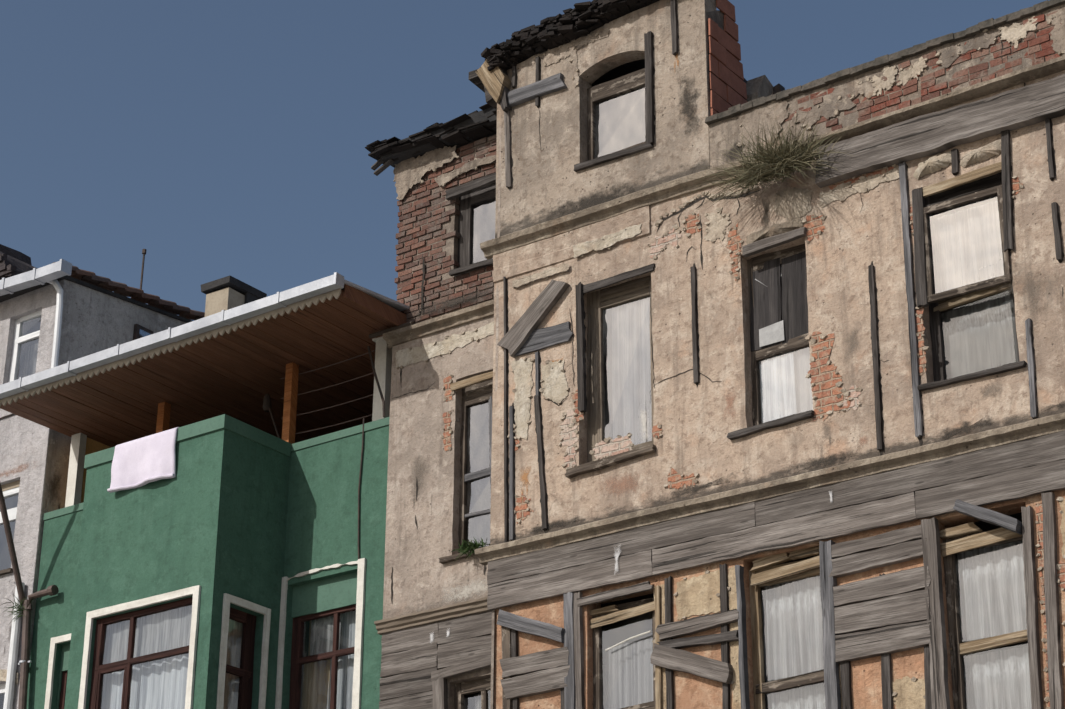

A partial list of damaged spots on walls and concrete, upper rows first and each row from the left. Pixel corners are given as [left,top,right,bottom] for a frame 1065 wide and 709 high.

leakage [679,80,699,131]
flaking render [737,11,1065,156]
crack [655,186,759,270]
spalling [441,375,455,451]
peeling [507,357,634,469]
crack [649,288,722,400]
spalling [805,331,862,422]
spalling [514,494,534,523]
spalling [663,467,699,490]
spalling [1035,497,1065,709]